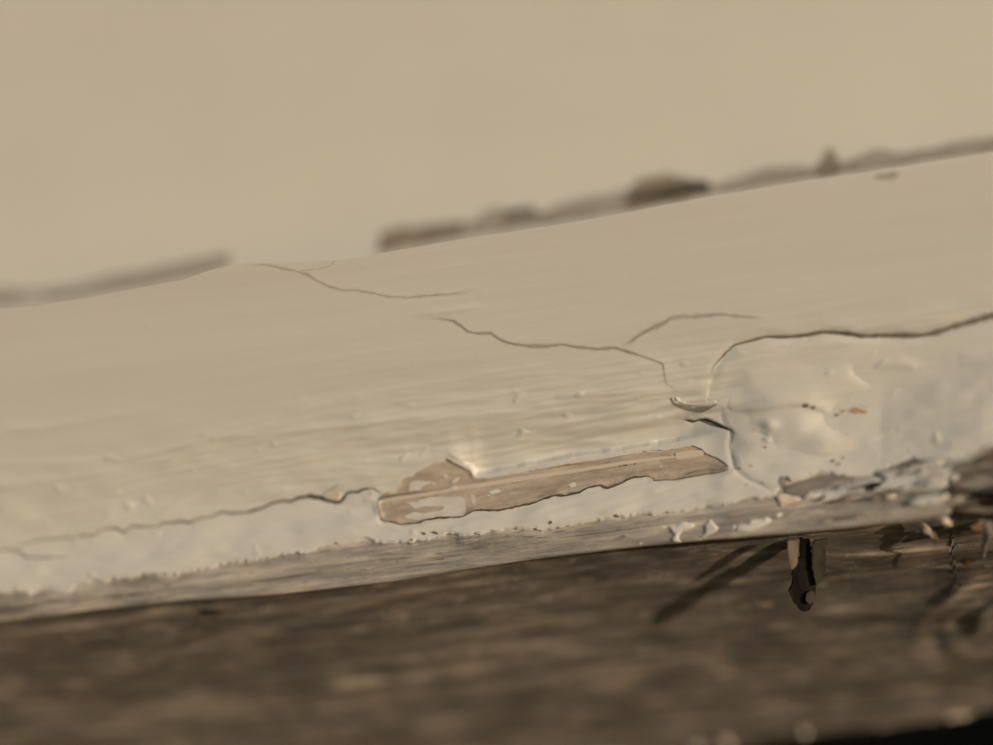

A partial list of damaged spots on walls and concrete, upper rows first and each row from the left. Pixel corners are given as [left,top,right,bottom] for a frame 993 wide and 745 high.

crack [451,313,993,486]
crack [0,484,380,559]
peeling [378,433,740,541]
peeling [662,513,783,543]
peeling [780,457,855,497]